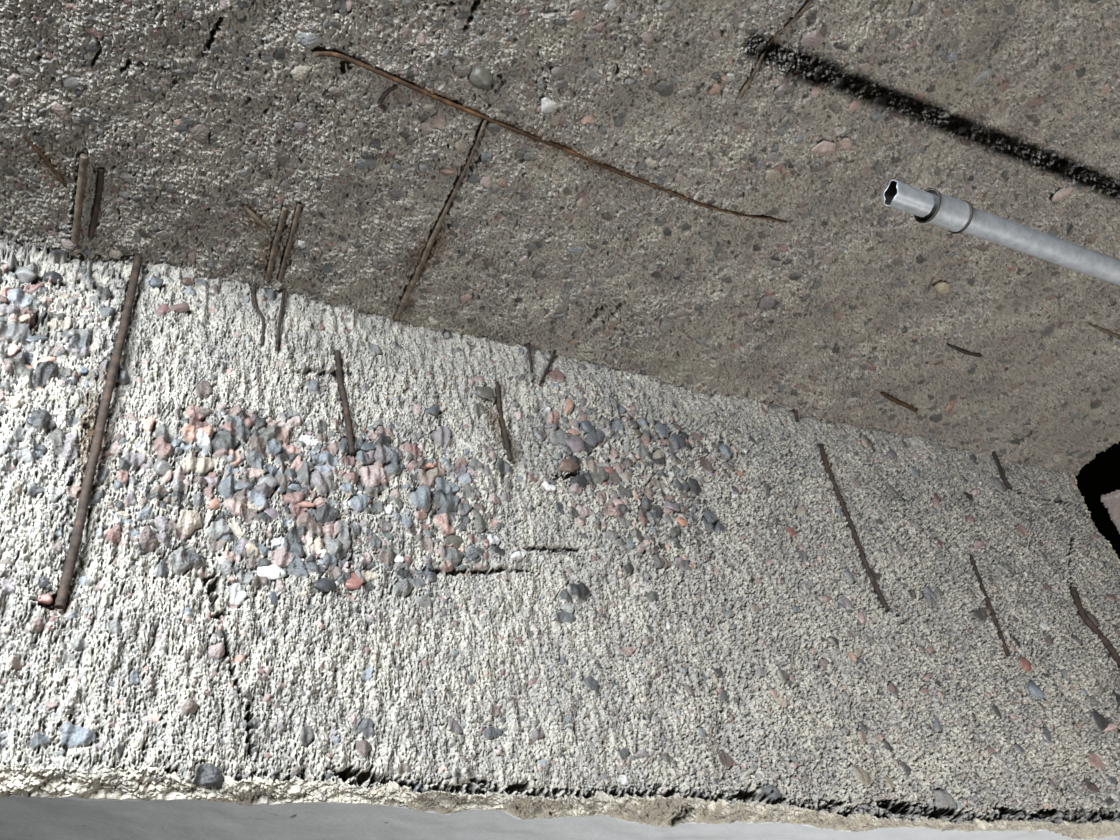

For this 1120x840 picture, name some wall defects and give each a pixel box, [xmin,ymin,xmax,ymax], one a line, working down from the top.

spalling [23,136,67,187]
spalling [88,167,104,239]
spalling [316,51,788,321]
spalling [25,311,50,346]
spalling [578,294,627,333]
spalling [30,254,143,611]
spalling [274,350,381,455]
spalling [495,381,513,462]
spalling [205,572,221,607]
spalling [396,566,554,578]
spalling [508,545,604,553]